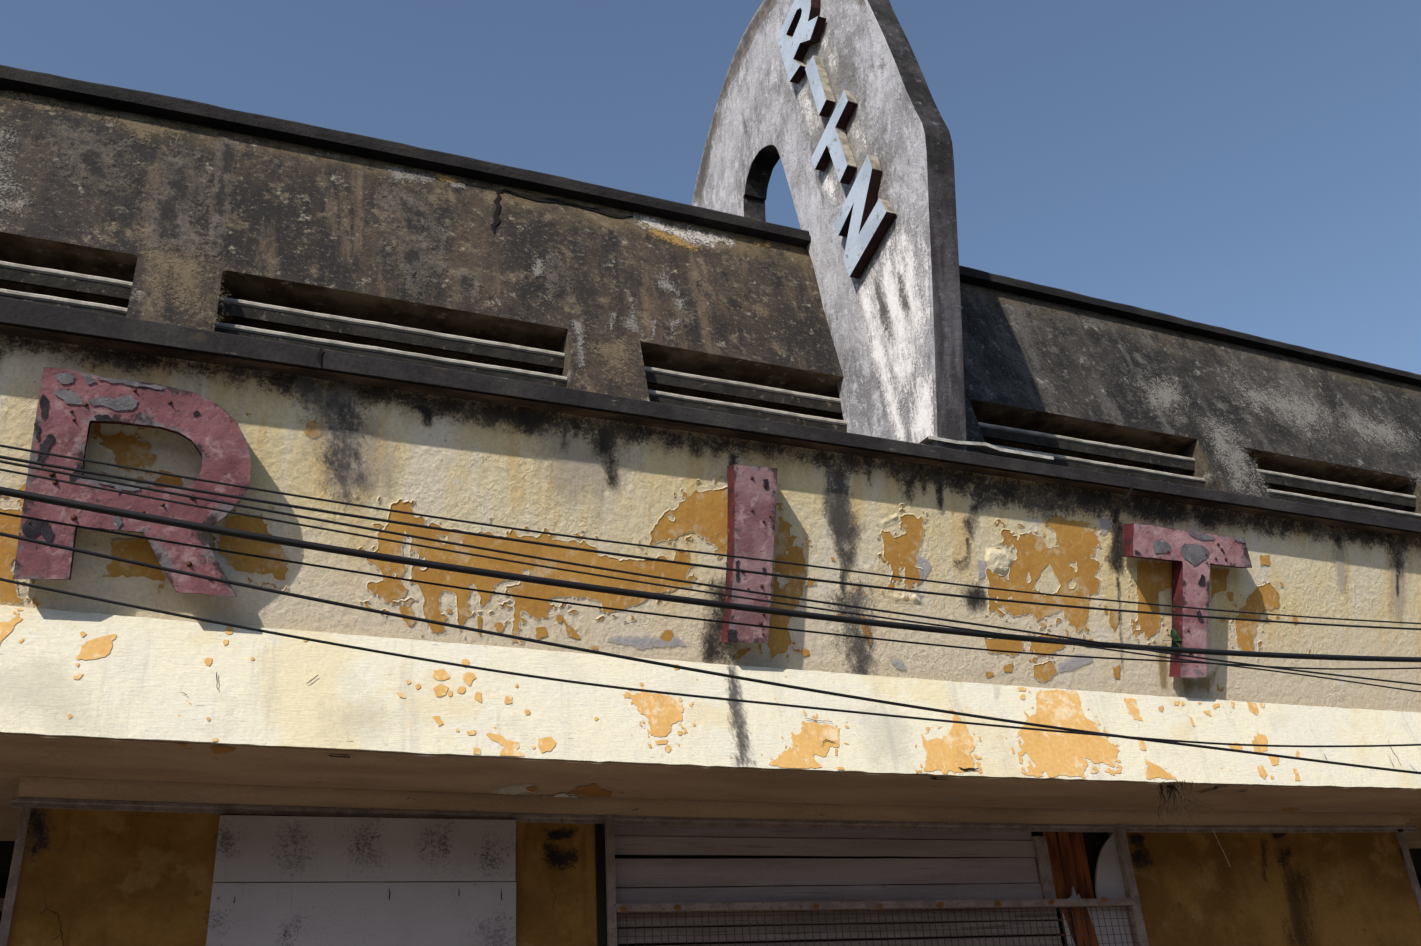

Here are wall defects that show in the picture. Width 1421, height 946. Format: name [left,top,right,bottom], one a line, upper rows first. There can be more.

crack [490,189,633,233]
leakage [692,0,777,203]
leakage [790,23,901,218]
leakage [852,213,934,445]
peeling [0,483,54,643]
peeling [357,474,740,649]
peeling [623,682,696,752]
leakage [607,578,755,765]
leakage [0,333,1421,668]
peeling [761,710,849,770]
peeling [915,709,982,774]
peeling [983,510,1300,781]